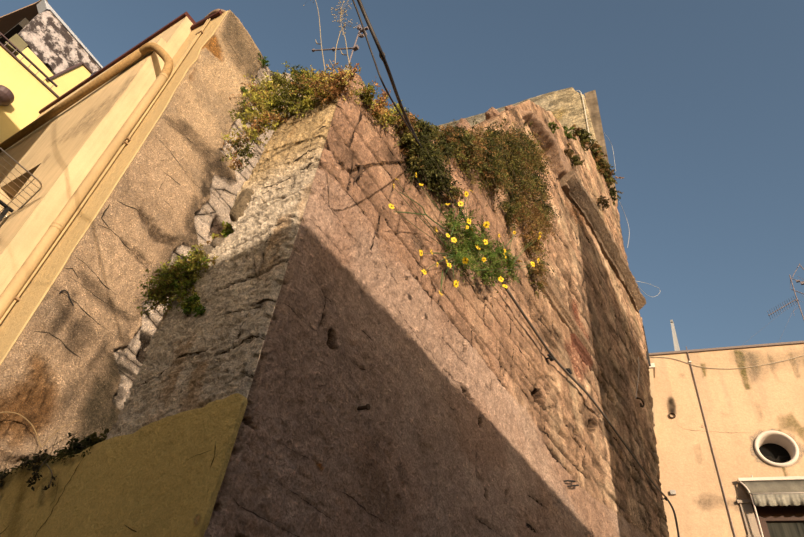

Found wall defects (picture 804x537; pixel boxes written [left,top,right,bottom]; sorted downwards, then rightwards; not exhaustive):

crack [96,199,151,272]
crack [57,256,126,336]
crack [35,331,79,357]